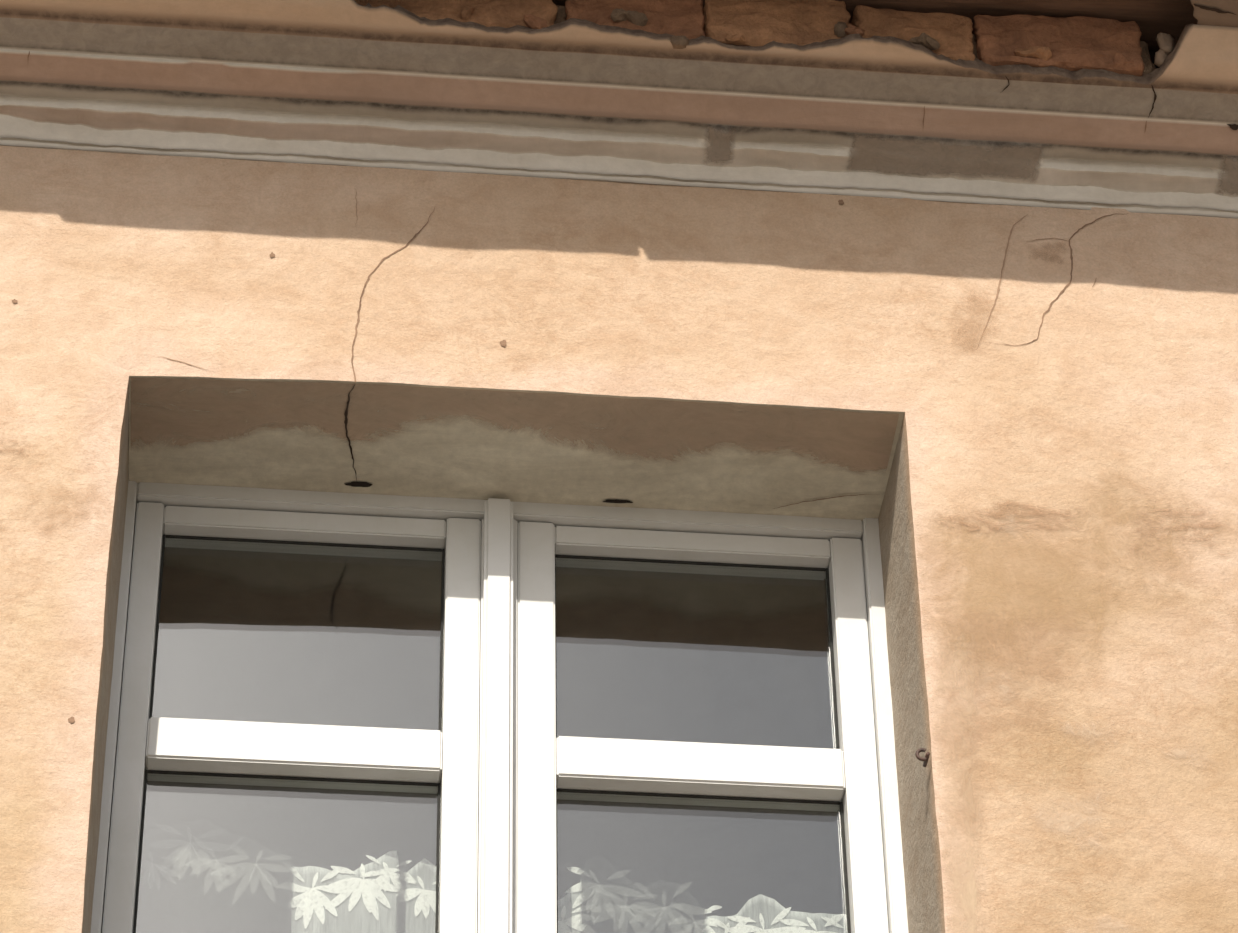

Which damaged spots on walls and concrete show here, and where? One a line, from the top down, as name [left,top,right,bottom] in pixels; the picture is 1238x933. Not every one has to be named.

flaking render [355,0,1174,76]
crack [344,208,435,480]
crack [978,213,1129,346]